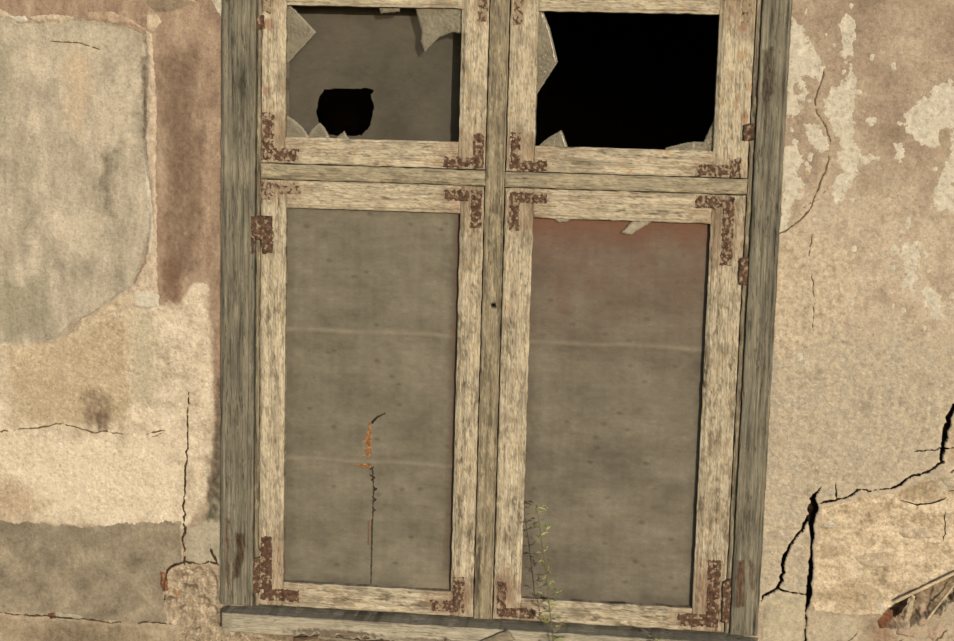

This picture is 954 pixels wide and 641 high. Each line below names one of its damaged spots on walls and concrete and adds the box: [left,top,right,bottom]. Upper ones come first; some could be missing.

peeling [0,0,196,344]
crack [779,71,831,328]
peeling [773,3,880,369]
peeling [891,239,954,331]
peeling [893,79,954,212]
crack [0,392,219,625]
spalling [160,564,336,641]
spalling [760,476,954,641]
crack [761,403,954,641]